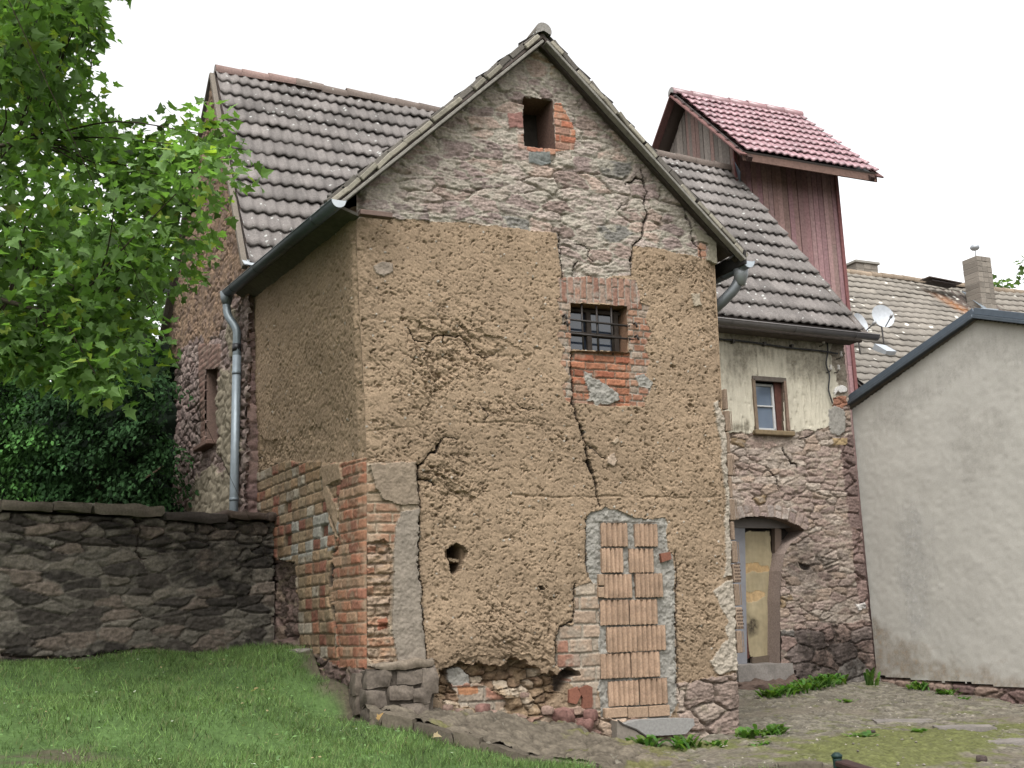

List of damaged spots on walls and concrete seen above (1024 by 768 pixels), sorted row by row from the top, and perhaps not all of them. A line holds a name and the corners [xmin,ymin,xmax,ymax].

crack [557,234,594,279]
crack [617,170,649,276]
flaking render [693,227,718,263]
flaking render [367,461,477,664]
crack [416,435,458,659]
spalling [436,656,581,717]